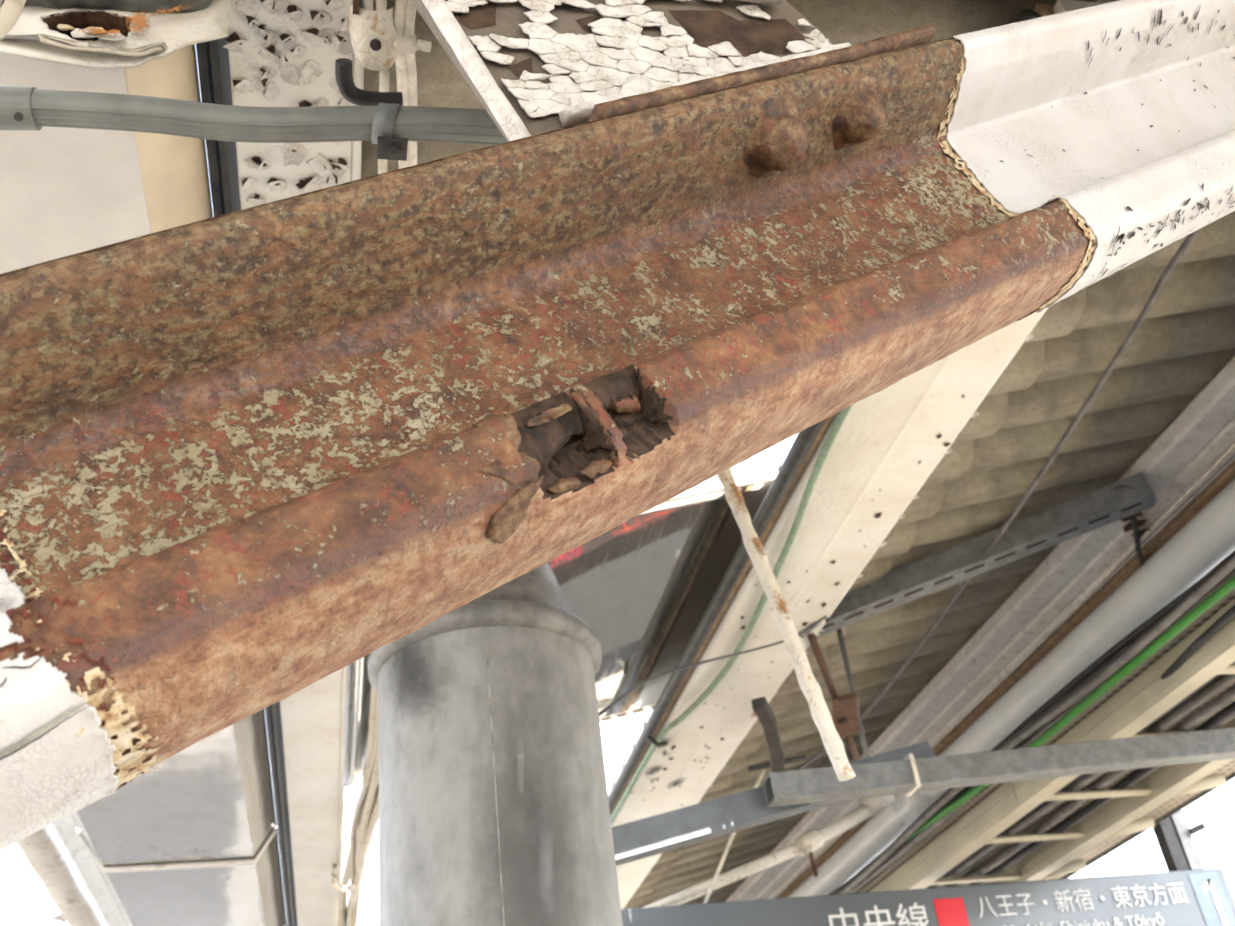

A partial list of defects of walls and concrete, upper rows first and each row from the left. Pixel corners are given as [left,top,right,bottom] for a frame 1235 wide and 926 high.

peeling [222,0,354,107]
peeling [508,38,590,82]
peeling [459,0,643,50]
peeling [668,0,805,57]
peeling [242,141,349,206]
corrosion [0,38,1096,774]
spalling [472,392,641,544]
crack [0,655,43,688]
crack [0,702,89,760]